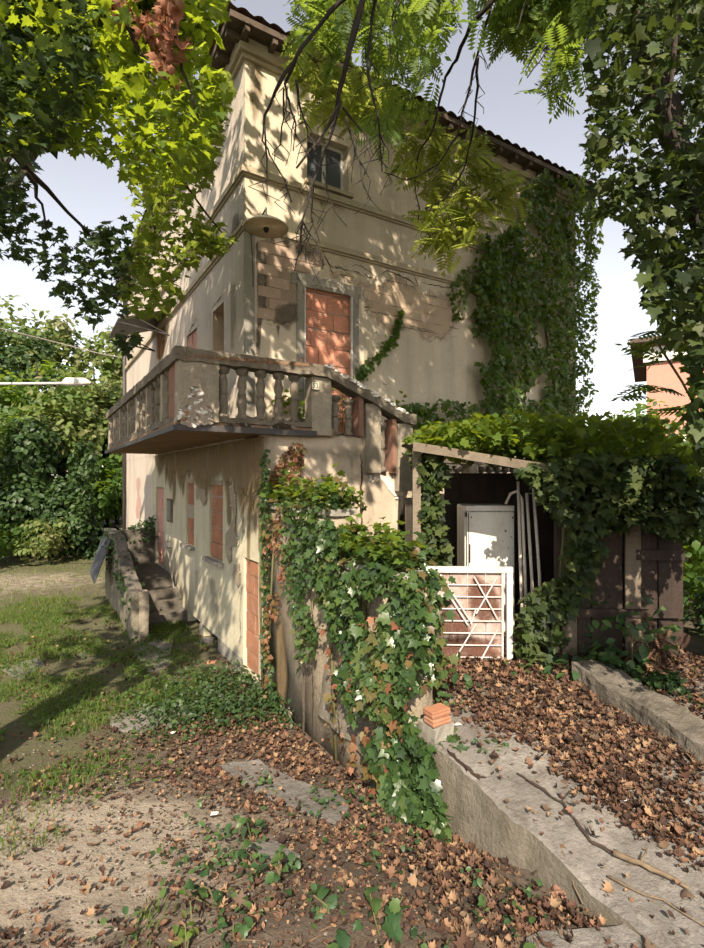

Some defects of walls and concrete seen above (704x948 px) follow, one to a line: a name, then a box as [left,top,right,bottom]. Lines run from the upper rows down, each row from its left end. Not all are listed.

damp [272,238,311,261]
damp [255,242,359,357]
flaking render [258,238,461,339]
crack [323,251,451,288]
spalling [178,381,253,428]
damp [154,436,267,562]